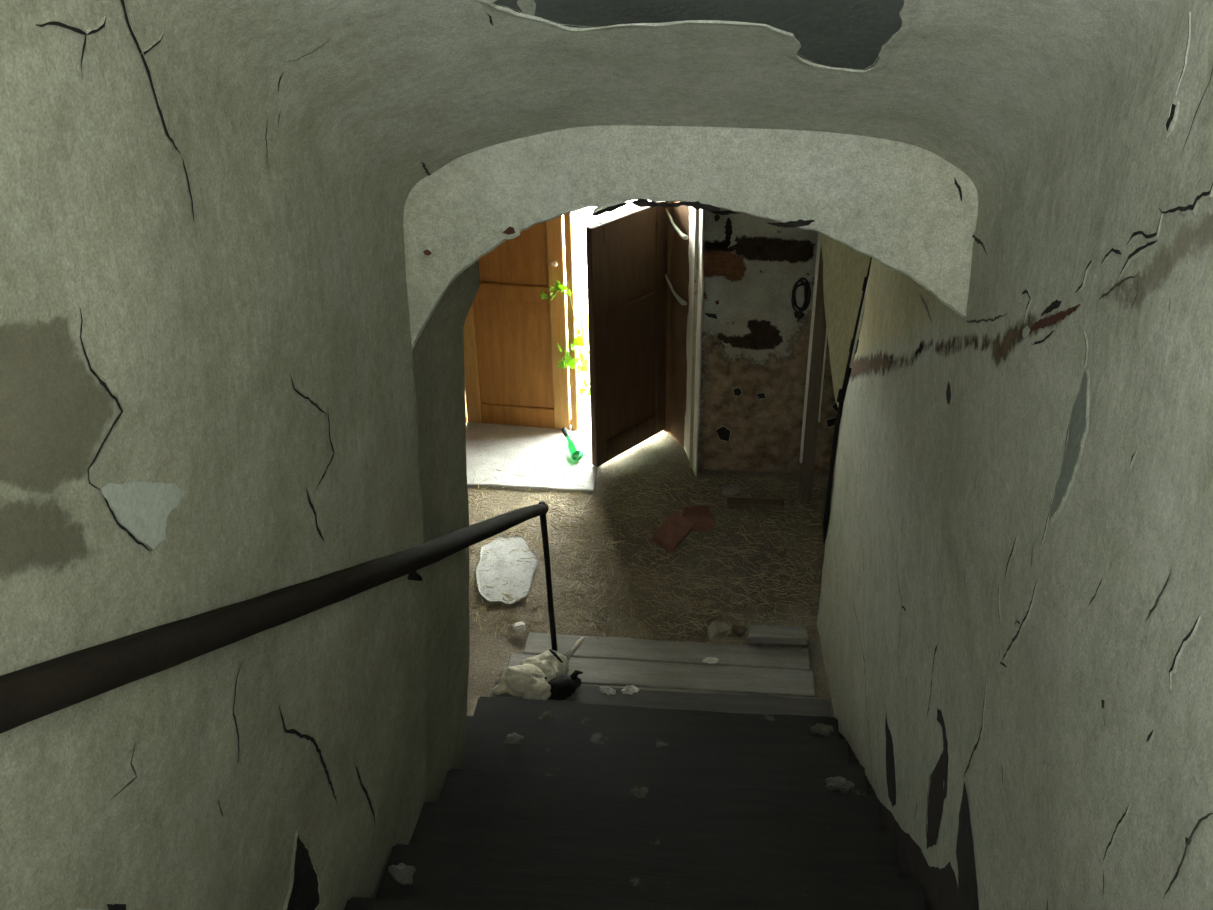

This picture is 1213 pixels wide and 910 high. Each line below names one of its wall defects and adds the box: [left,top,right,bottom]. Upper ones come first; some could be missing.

spalling [476,0,922,73]
crack [35,0,194,222]
flaking render [592,199,815,282]
crack [1075,178,1213,309]
corrosion [850,313,1060,380]
peeling [1030,330,1090,572]
spalling [839,644,979,910]